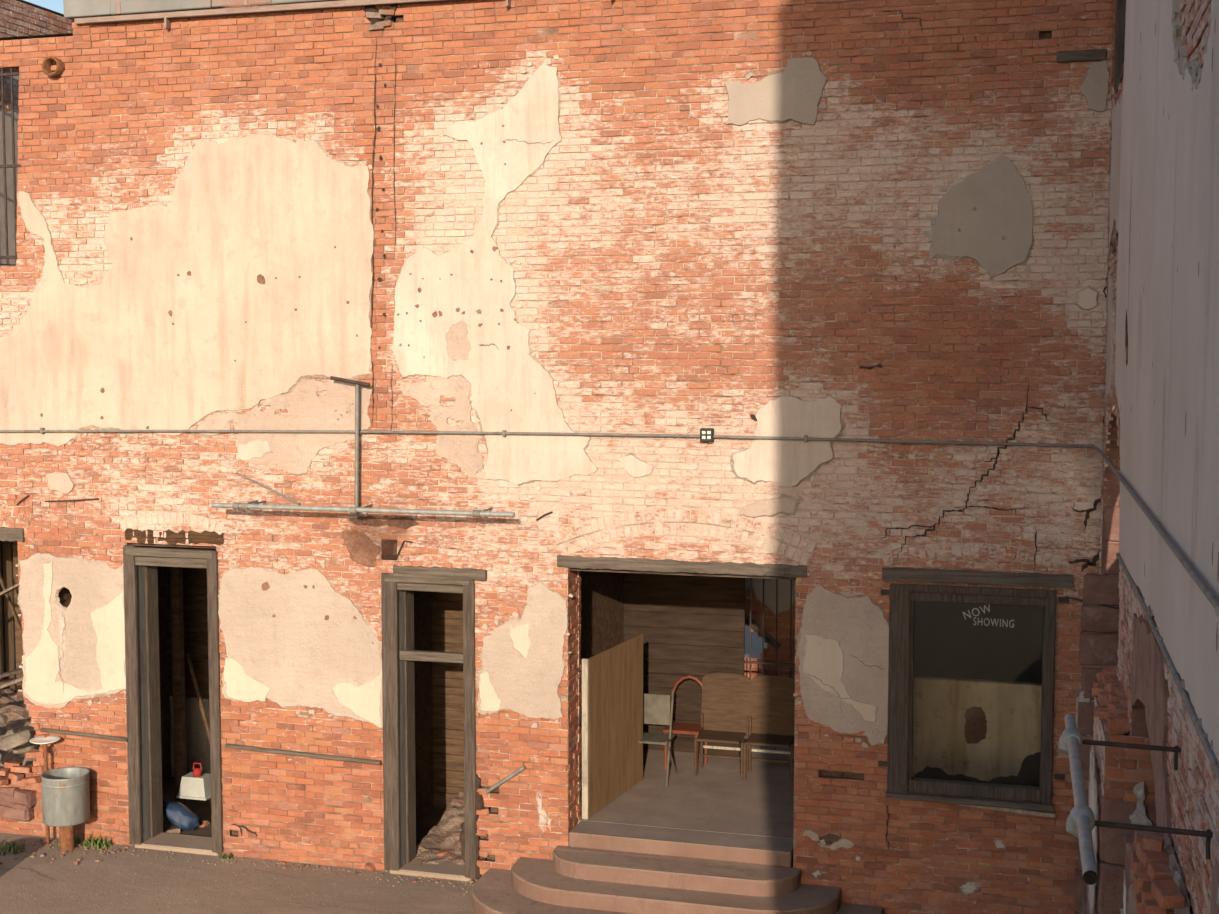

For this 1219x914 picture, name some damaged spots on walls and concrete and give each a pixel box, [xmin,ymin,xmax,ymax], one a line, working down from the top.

flaking render [724,51,828,131]
spalling [1171,0,1216,91]
flaking render [0,54,598,493]
crack [371,37,396,428]
flaking render [729,385,847,518]
crack [882,379,1049,571]
crack [1068,499,1101,571]
flaking render [15,545,126,709]
flaking render [218,563,383,728]
flaking render [793,583,889,748]
spalling [459,774,490,880]
spalling [1119,781,1185,914]